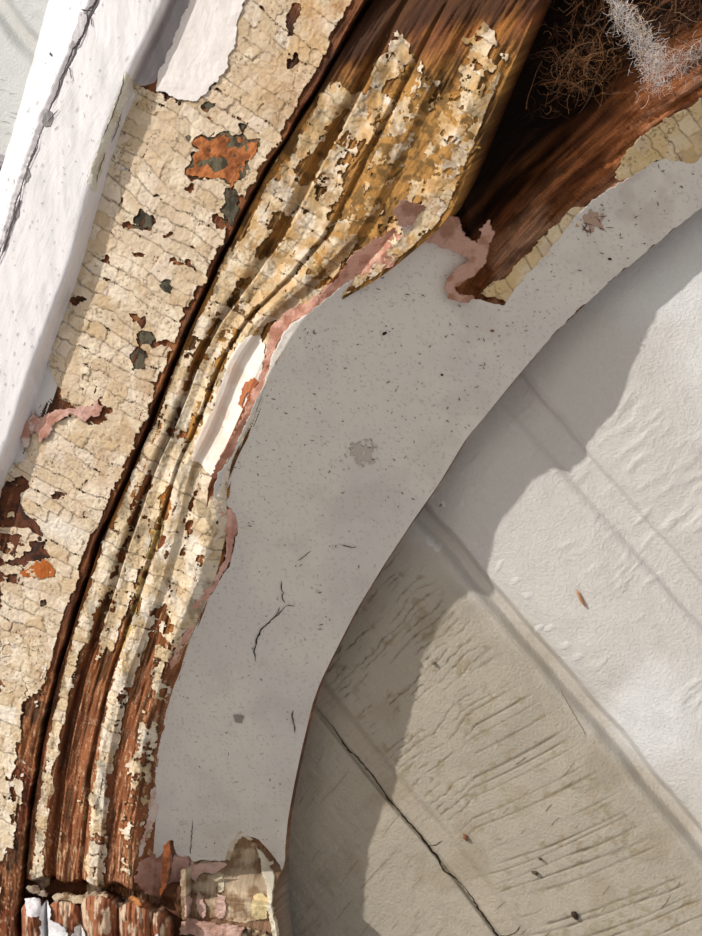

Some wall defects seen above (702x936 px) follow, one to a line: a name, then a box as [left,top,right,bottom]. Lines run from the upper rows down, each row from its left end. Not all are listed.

crack [0,0,136,420]
peeling [481,207,584,302]
peeling [615,98,702,180]
peeling [0,0,509,936]
crack [253,582,292,661]
crack [302,709,549,936]